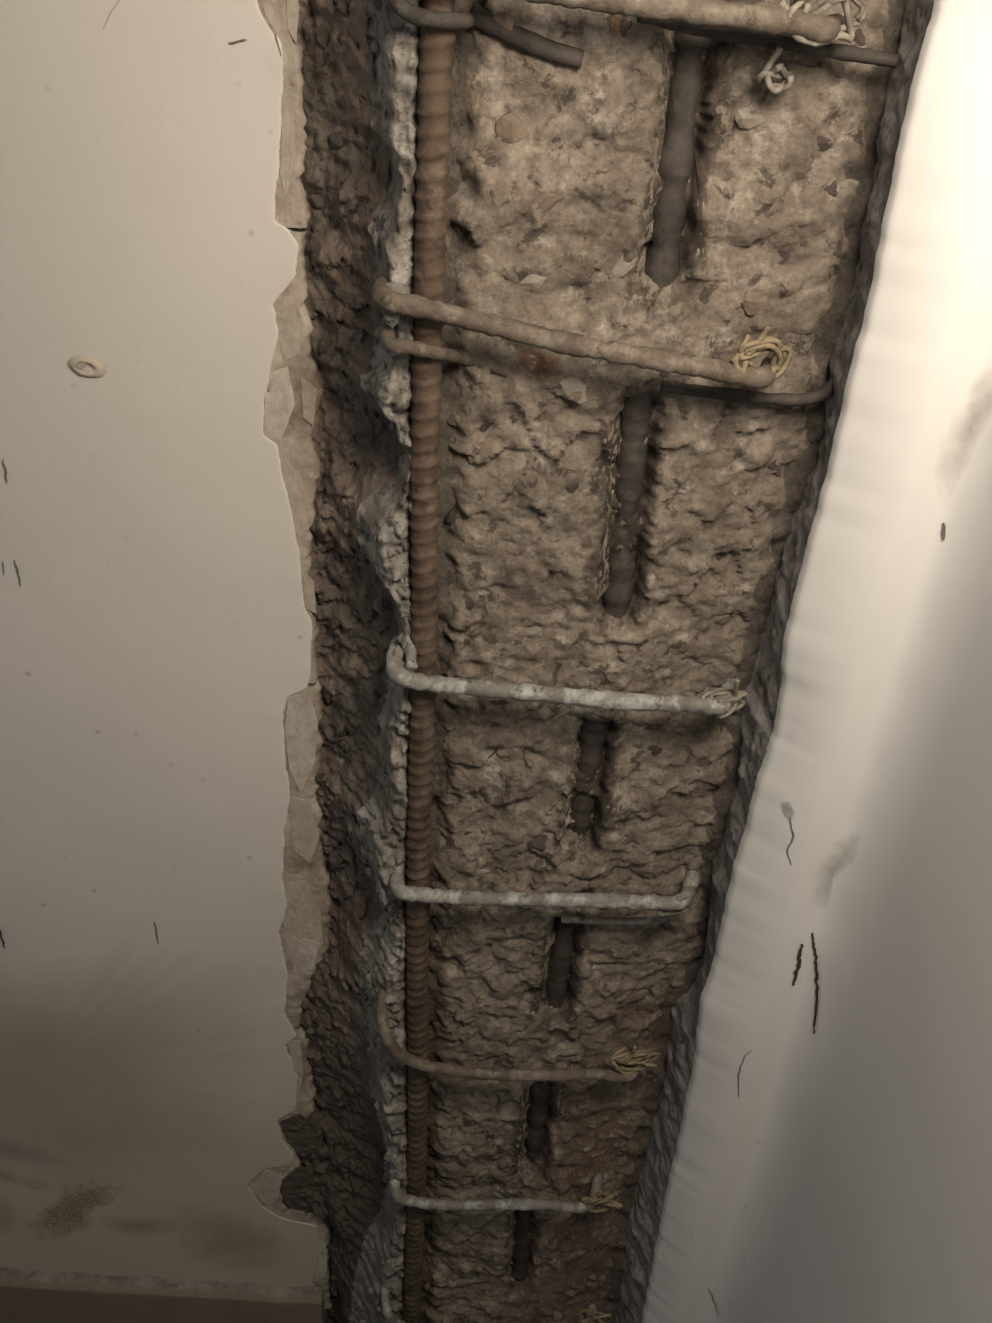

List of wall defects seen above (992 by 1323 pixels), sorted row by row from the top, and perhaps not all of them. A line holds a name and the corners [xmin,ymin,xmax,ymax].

rust [678,38,731,287]
rust [586,407,663,624]
spalling [247,0,403,1323]
spalling [422,0,934,1323]
rust [557,722,620,851]
rust [531,917,594,1025]